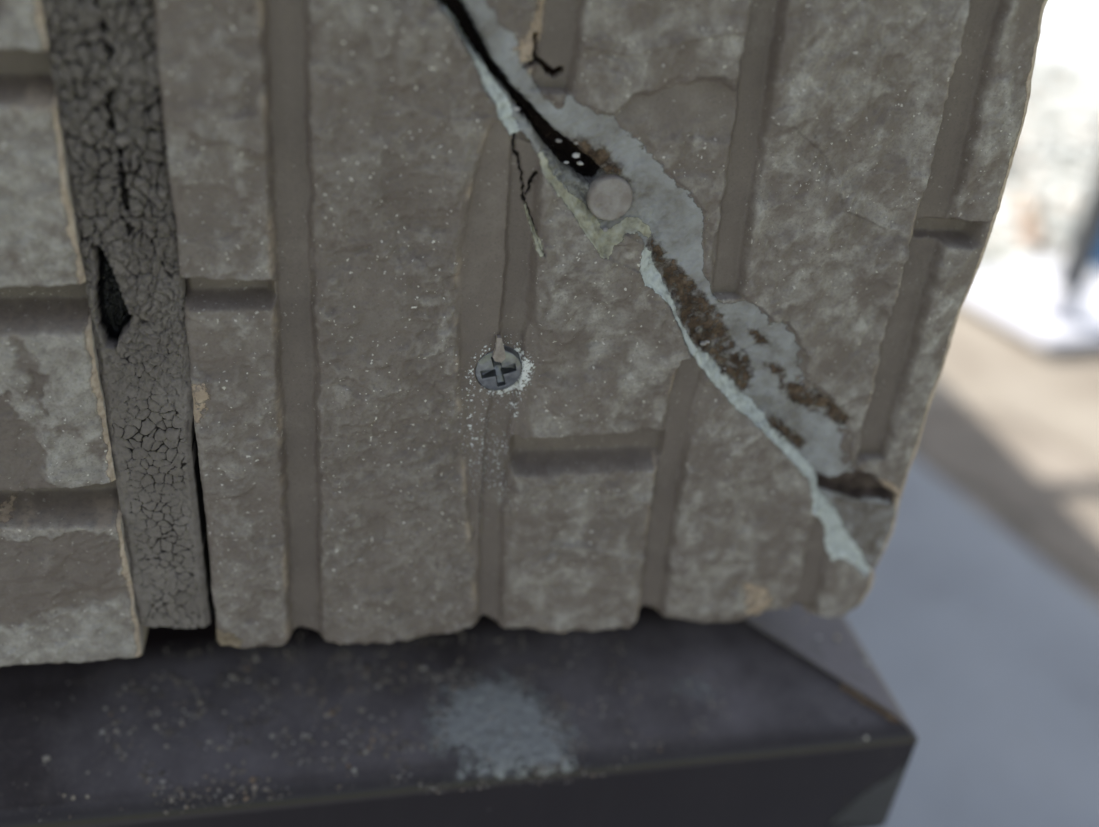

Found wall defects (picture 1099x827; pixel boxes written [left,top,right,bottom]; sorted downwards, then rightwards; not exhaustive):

crack [47,0,200,628]
peeling [492,335,506,362]
peeling [513,0,545,63]
crack [436,0,891,576]